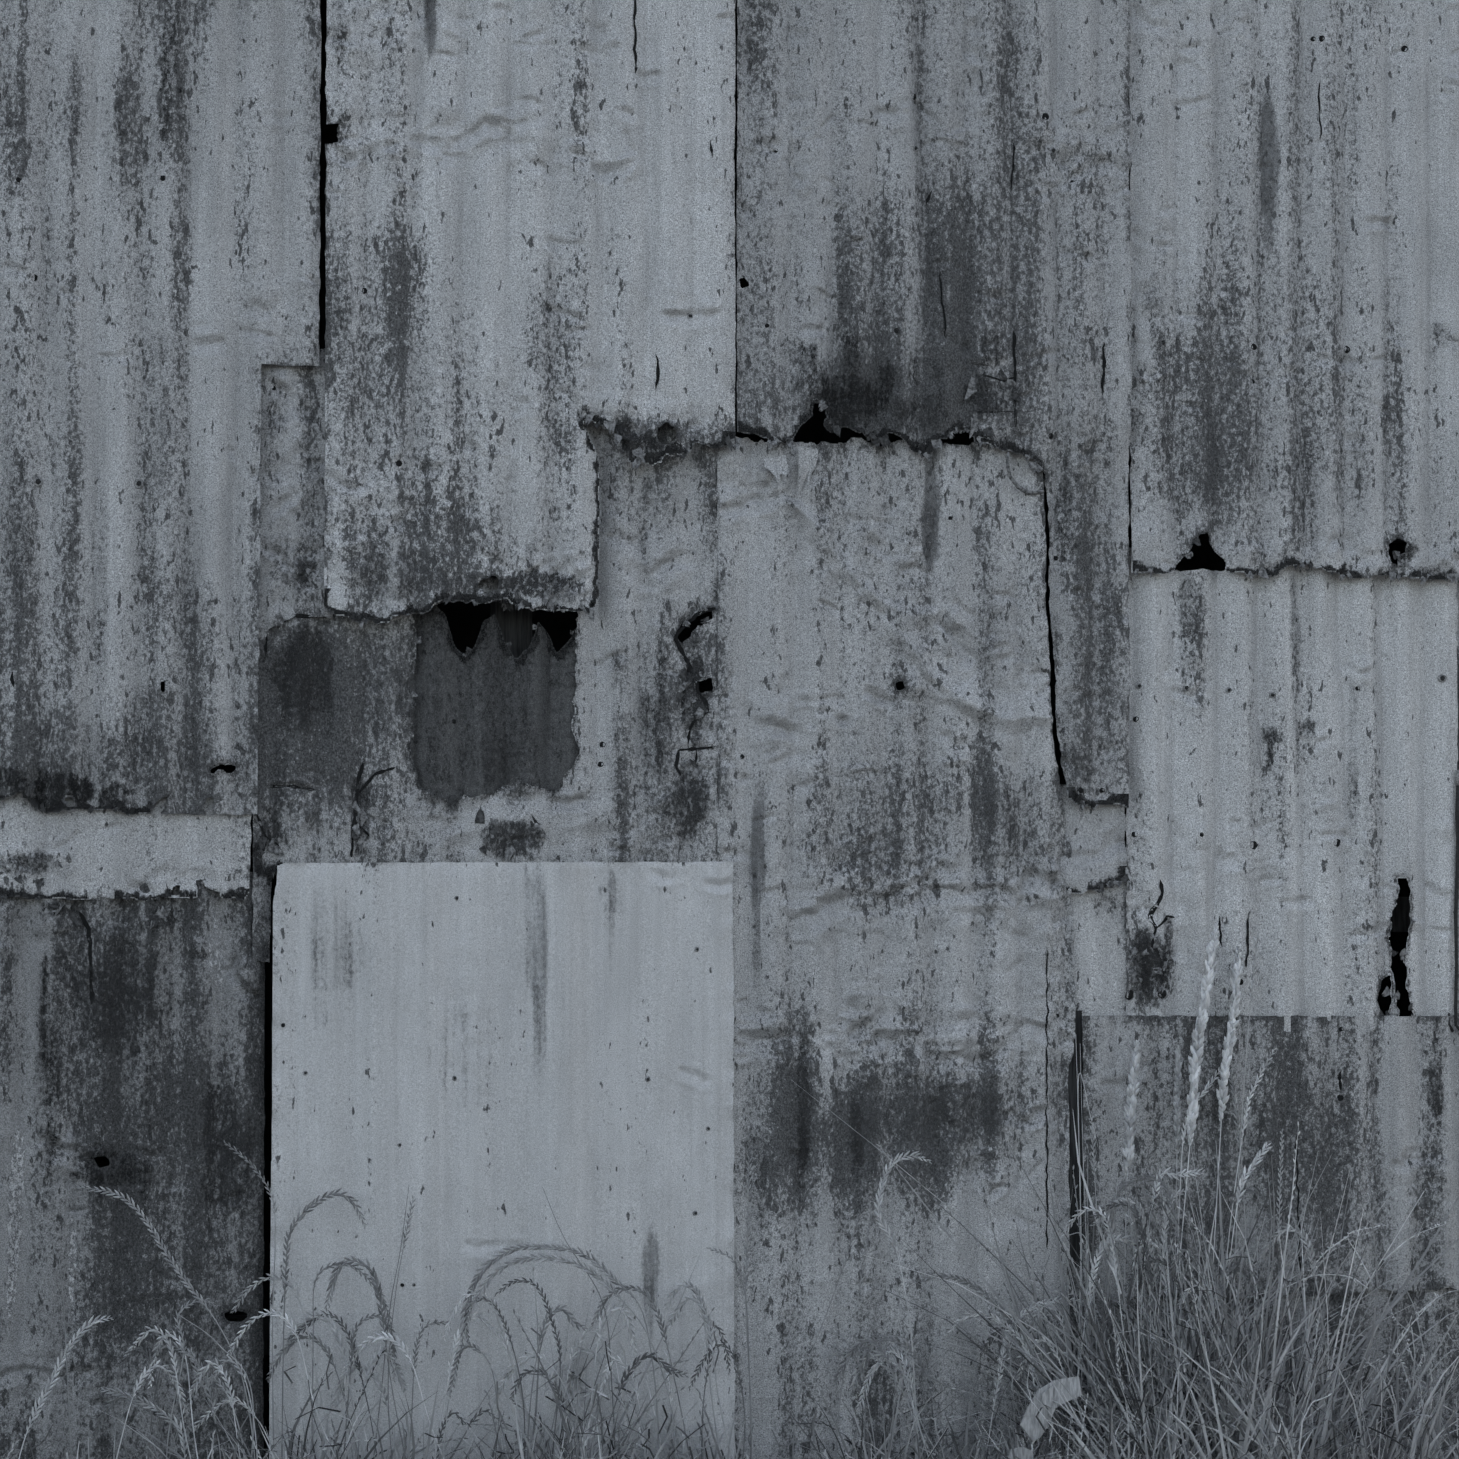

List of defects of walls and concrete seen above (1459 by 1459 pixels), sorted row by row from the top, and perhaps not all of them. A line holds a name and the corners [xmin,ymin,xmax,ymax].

peeling [1379,986,1400,1016]